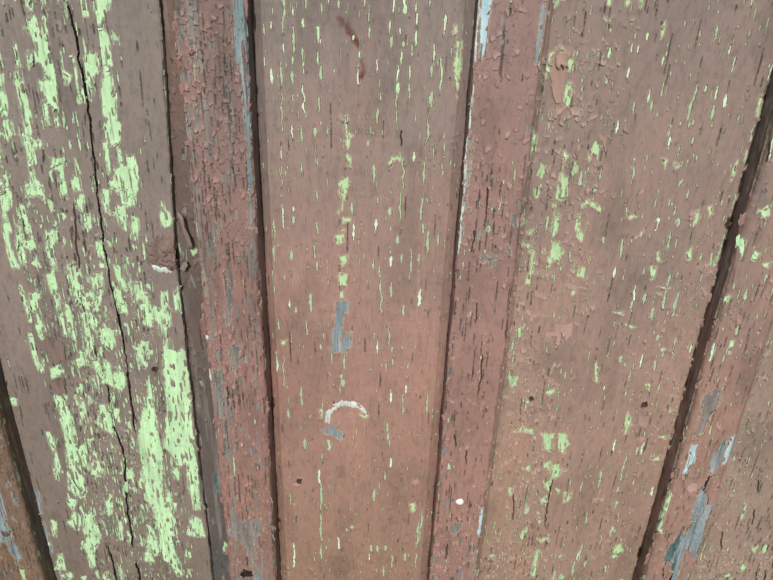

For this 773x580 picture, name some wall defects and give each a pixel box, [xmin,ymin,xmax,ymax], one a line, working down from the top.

crack [67,3,141,580]
peeling [18,229,206,580]
peeling [232,0,258,234]
spalling [264,0,307,141]
peeling [310,256,369,459]
peeling [335,116,355,244]
spalling [389,0,418,124]
peeling [457,0,492,254]
peeling [544,151,569,267]
spalling [707,193,771,303]
peeling [0,494,26,580]
peeling [663,434,736,580]